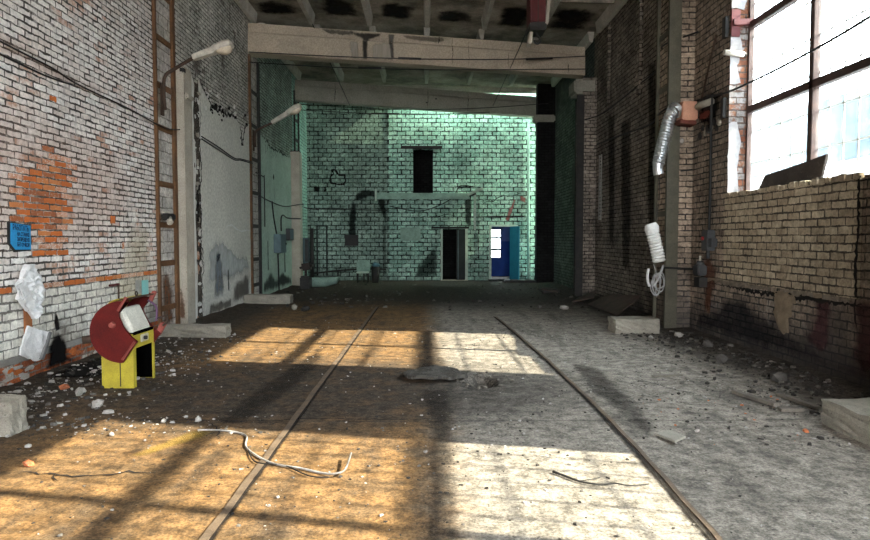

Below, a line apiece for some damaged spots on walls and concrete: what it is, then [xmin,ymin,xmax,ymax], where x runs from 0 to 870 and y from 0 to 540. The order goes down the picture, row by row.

damp [255,1,295,14]
damp [322,0,357,16]
damp [382,3,414,19]
damp [439,11,471,22]
damp [498,7,527,26]
damp [549,9,591,29]
peeling [8,146,77,256]
flaking render [191,75,249,319]
crack [853,176,861,327]
damp [210,244,249,313]
damp [699,303,800,352]